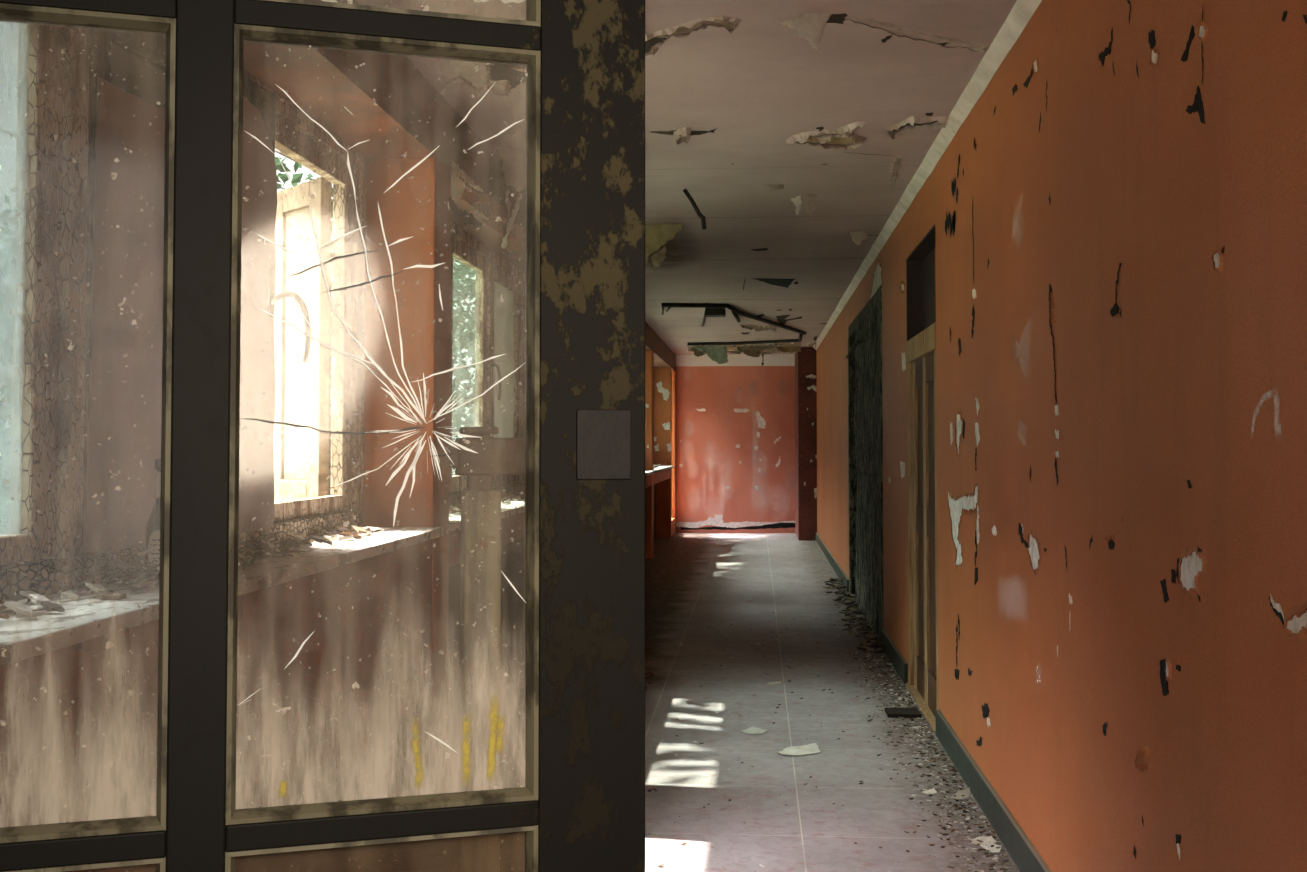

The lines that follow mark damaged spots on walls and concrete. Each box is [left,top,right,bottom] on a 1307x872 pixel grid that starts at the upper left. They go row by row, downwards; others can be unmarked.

peeling [645,15,742,57]
peeling [827,13,990,53]
peeling [439,59,526,97]
peeling [1181,9,1209,124]
peeling [651,127,717,144]
peeling [785,121,867,150]
peeling [884,112,955,139]
peeling [448,147,526,250]
peeling [1048,284,1059,470]
peeling [947,398,997,585]
peeling [1018,523,1047,576]
peeling [1269,594,1307,643]